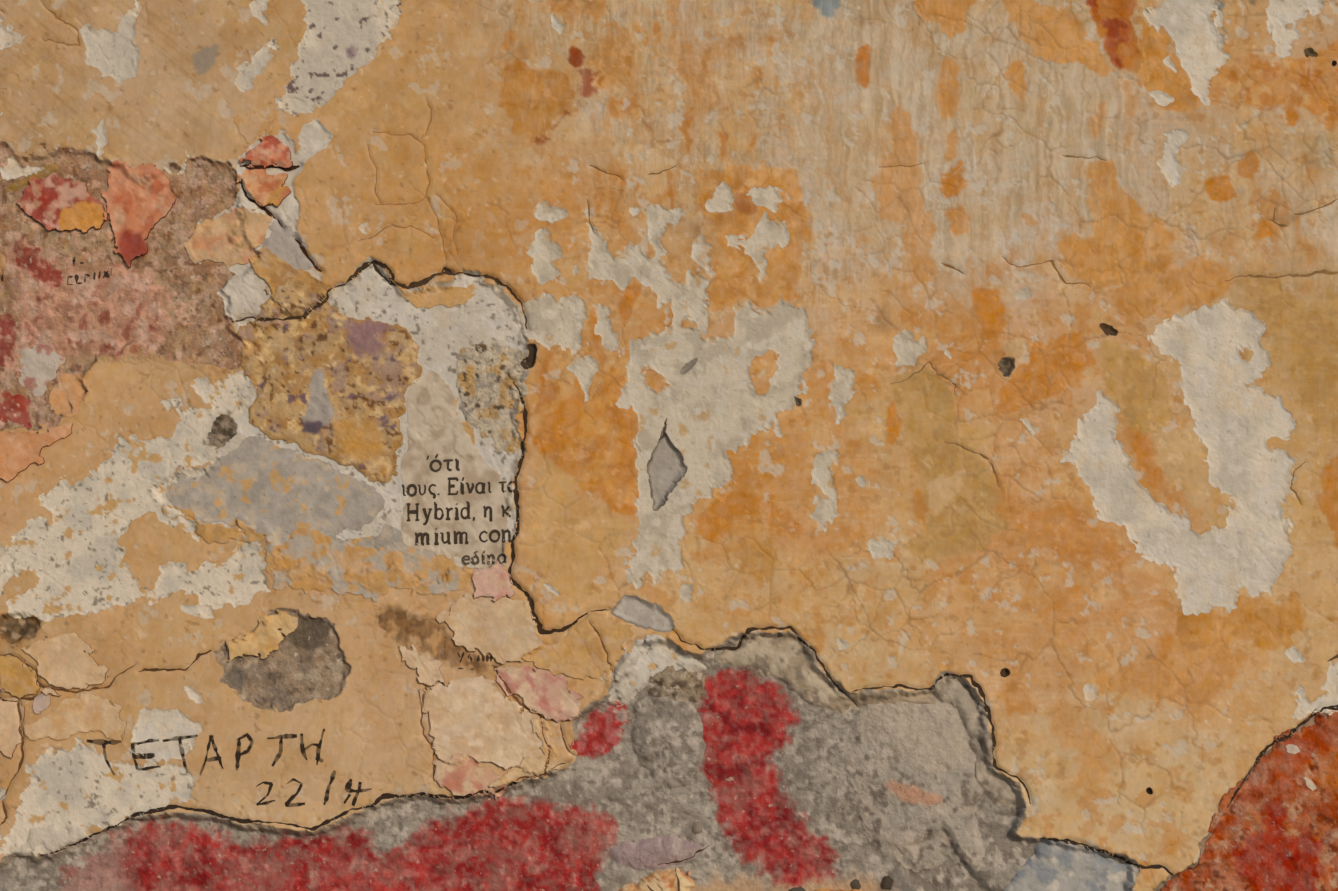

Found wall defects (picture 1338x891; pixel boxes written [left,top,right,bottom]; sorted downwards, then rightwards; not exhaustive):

peeling [79,0,142,84]
peeling [275,0,402,117]
peeling [1143,0,1231,106]
peeling [1156,129,1189,188]
crack [1269,199,1337,227]
crack [1002,256,1089,286]
crack [1227,269,1338,281]
crack [890,362,957,393]
spalling [0,111,1140,891]
crack [945,442,1000,488]
peeling [1060,298,1297,616]
crack [1290,462,1305,505]